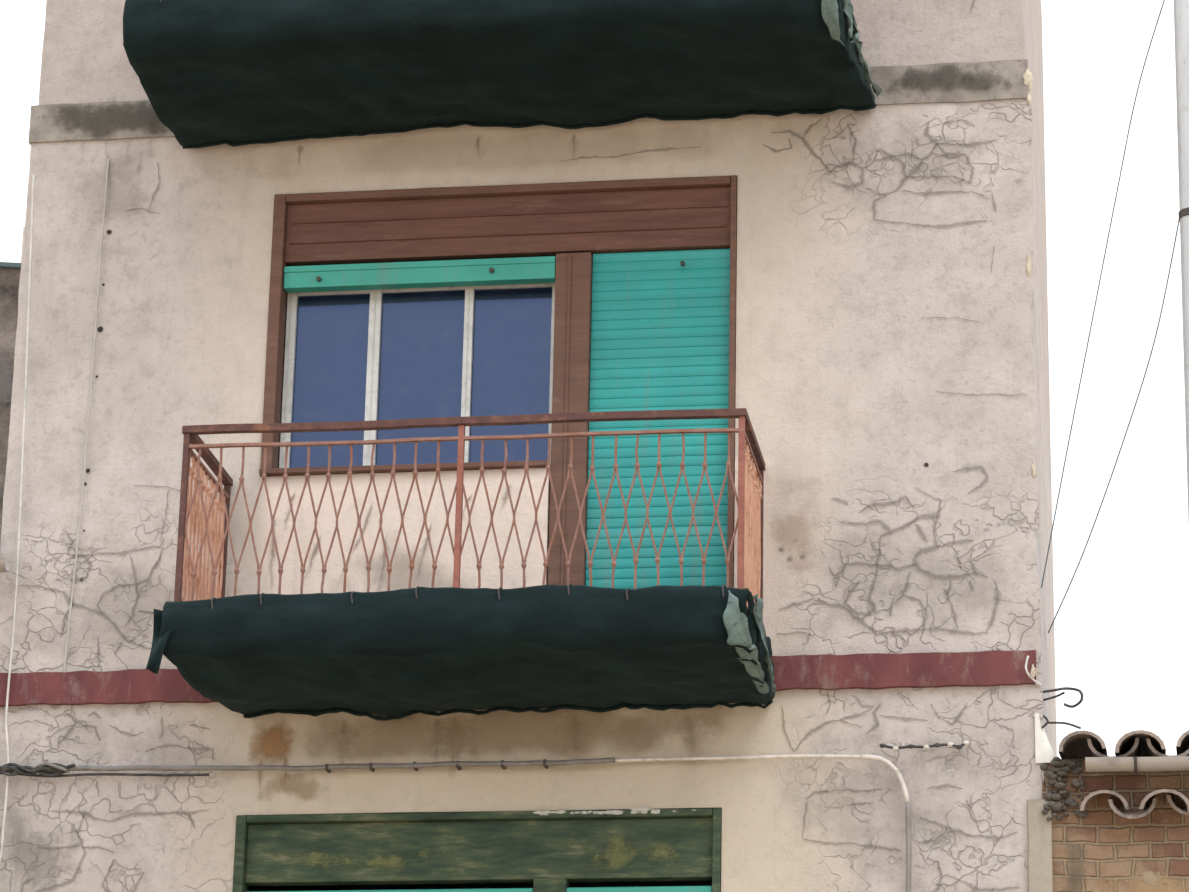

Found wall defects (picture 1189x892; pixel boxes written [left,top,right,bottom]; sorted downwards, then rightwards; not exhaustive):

leakage [889,65,1010,91]
leakage [57,102,166,136]
leakage [360,710,654,755]